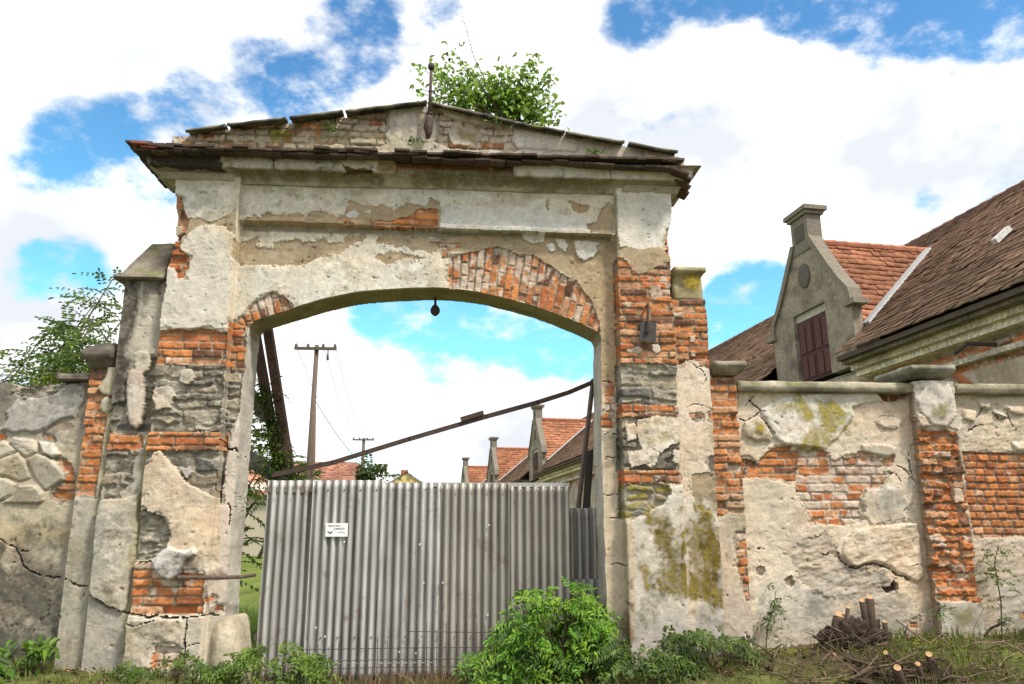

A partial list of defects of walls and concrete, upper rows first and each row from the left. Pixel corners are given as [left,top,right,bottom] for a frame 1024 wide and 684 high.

flaking render [0,291,294,504]
flaking render [169,195,1024,616]
crack [0,538,220,654]
flaking render [131,509,224,615]
crack [822,551,926,580]